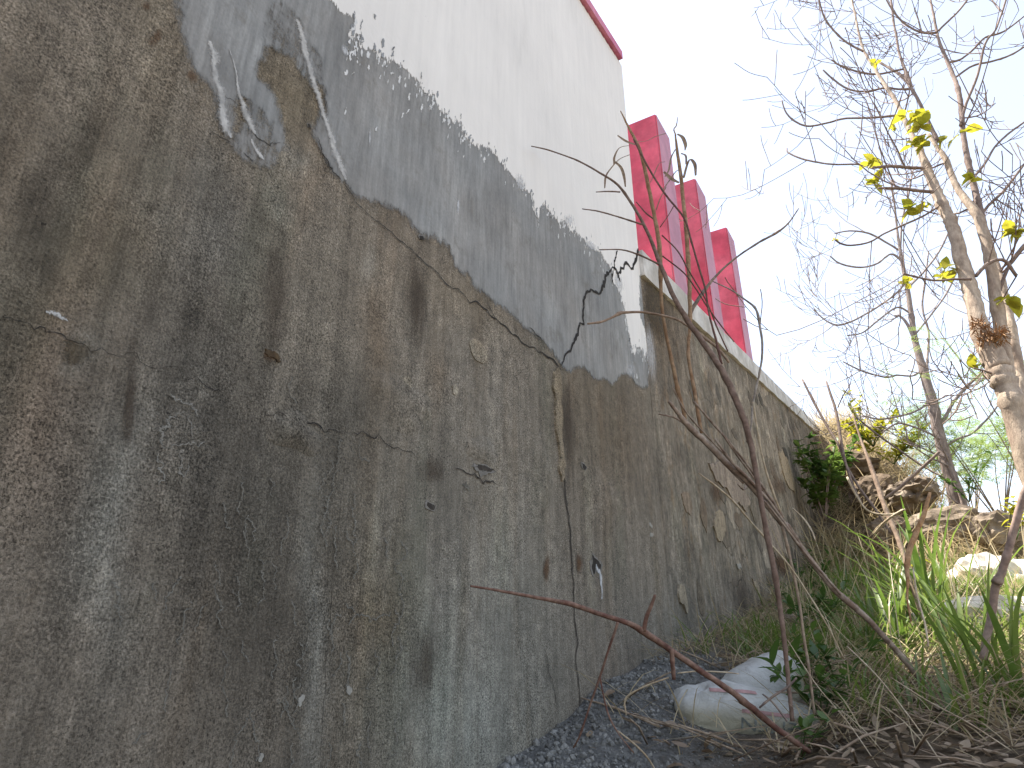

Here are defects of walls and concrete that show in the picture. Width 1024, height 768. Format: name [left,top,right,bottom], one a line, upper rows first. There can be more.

crack [4,317,220,391]
efflorescence [208,41,264,160]
crack [265,410,416,457]
peeling [344,11,612,273]
crack [318,138,639,370]
crack [546,478,581,707]